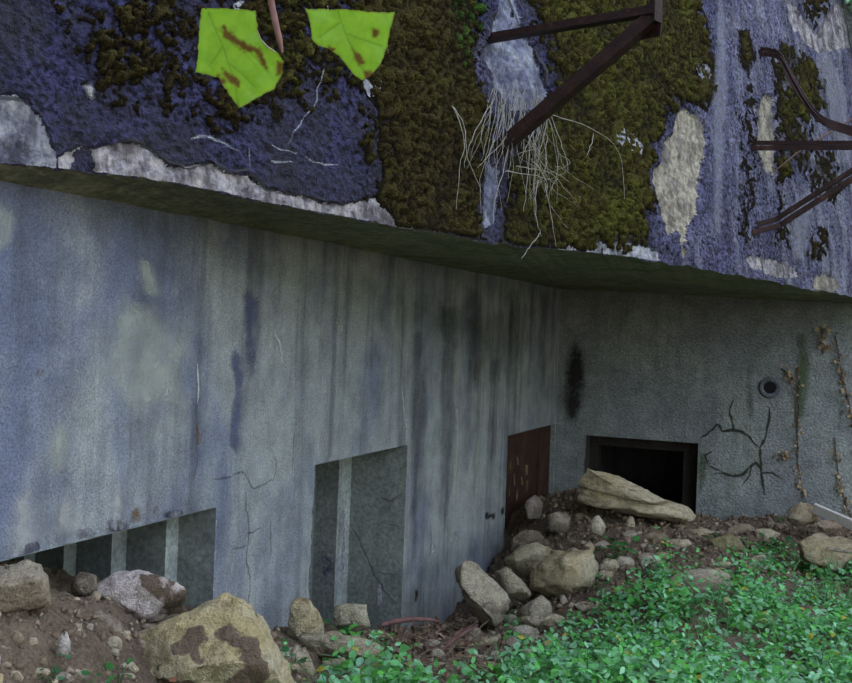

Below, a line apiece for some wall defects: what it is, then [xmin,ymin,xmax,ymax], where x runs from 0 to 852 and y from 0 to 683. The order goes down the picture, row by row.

spalling [482,0,547,111]
peeling [786,1,851,53]
spalling [0,94,413,229]
spalling [482,161,500,228]
spalling [652,108,706,259]
spalling [756,95,776,177]
damp [565,345,585,419]
crack [700,400,782,495]